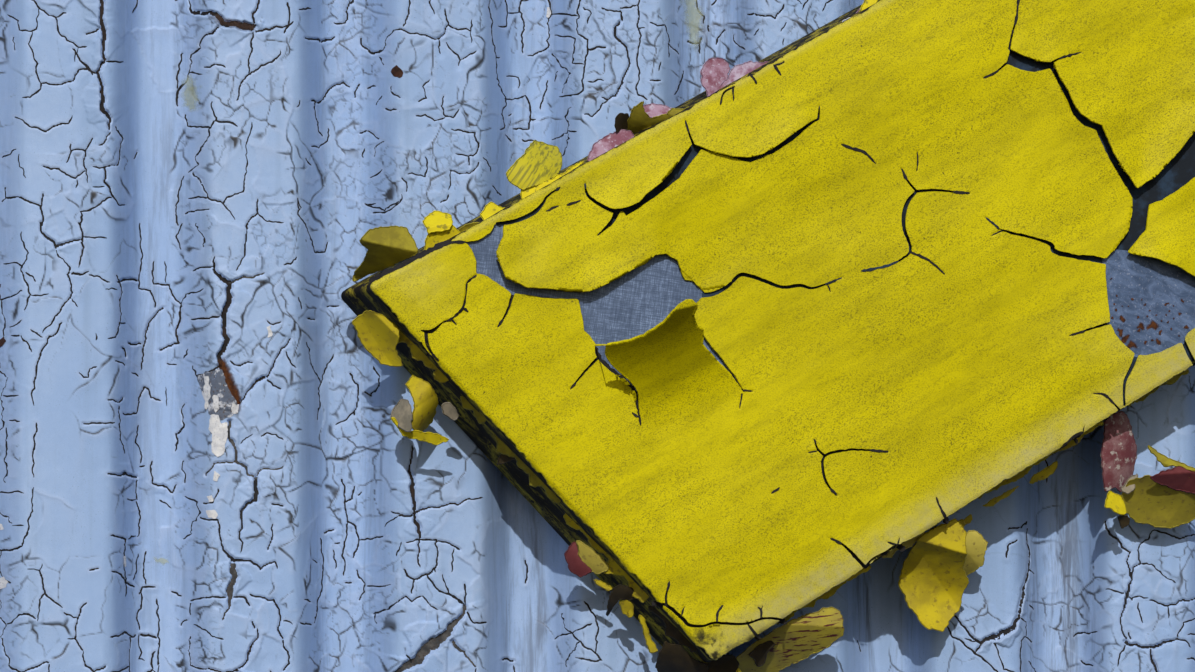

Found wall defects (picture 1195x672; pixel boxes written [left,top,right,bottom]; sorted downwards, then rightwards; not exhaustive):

crack [702,0,1195,297]
spalling [197,369,239,519]
corrosion [218,360,240,404]
crack [0,0,833,672]
peeling [352,202,703,394]
crack [1069,323,1107,336]
crack [1093,357,1137,412]
peeling [1102,249,1195,357]
corrosion [1111,295,1189,348]
crack [1183,341,1195,366]
crack [947,521,1036,672]
crack [1073,521,1195,672]